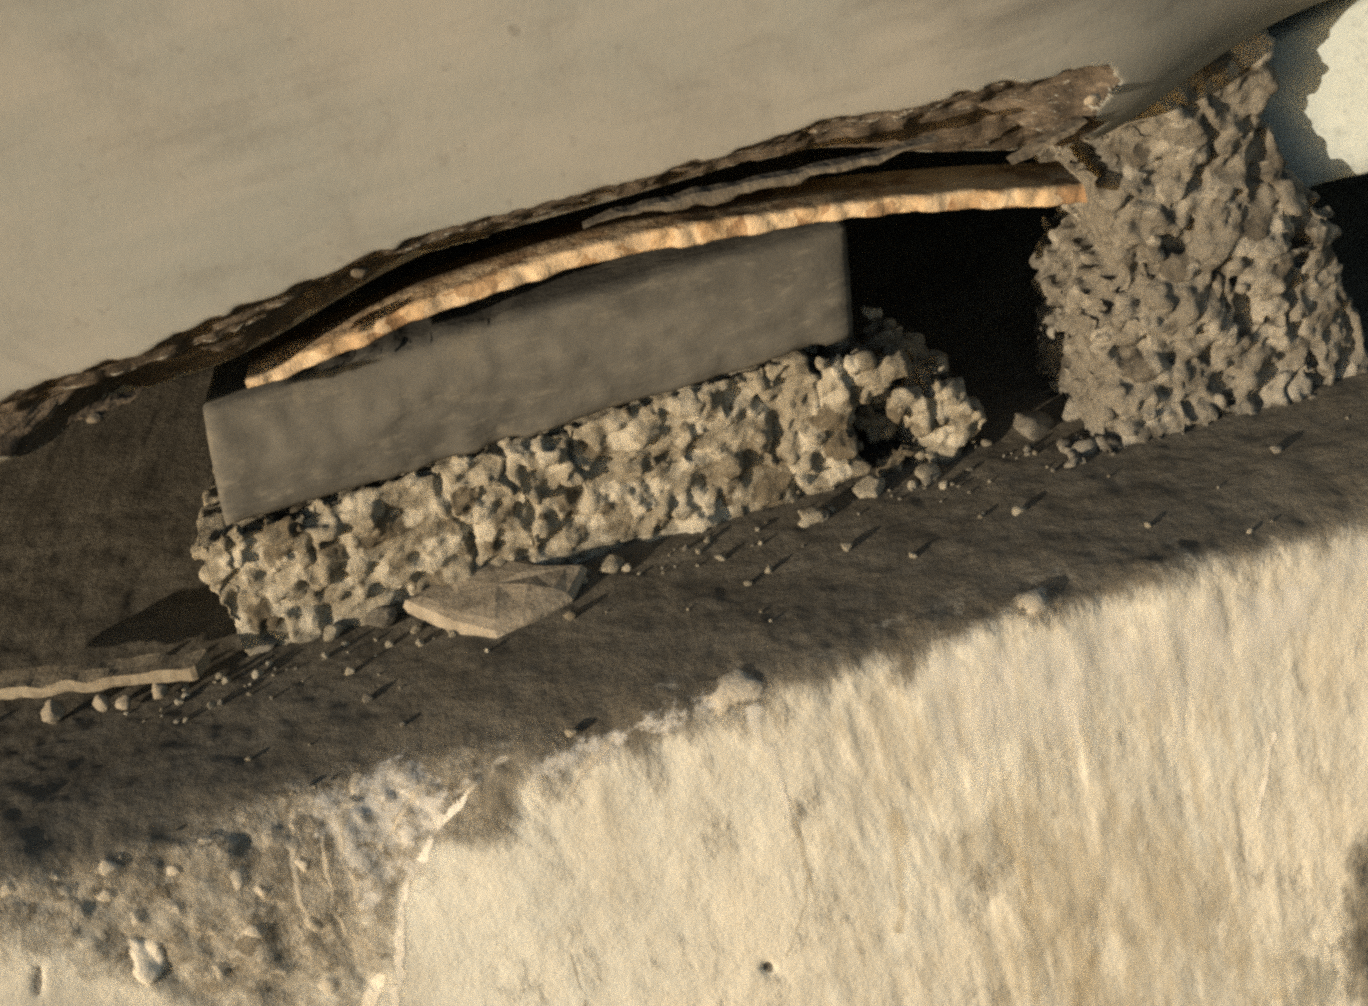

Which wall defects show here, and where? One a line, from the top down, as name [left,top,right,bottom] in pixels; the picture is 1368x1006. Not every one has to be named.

spalling [0,65,1120,457]
spalling [0,744,513,1006]